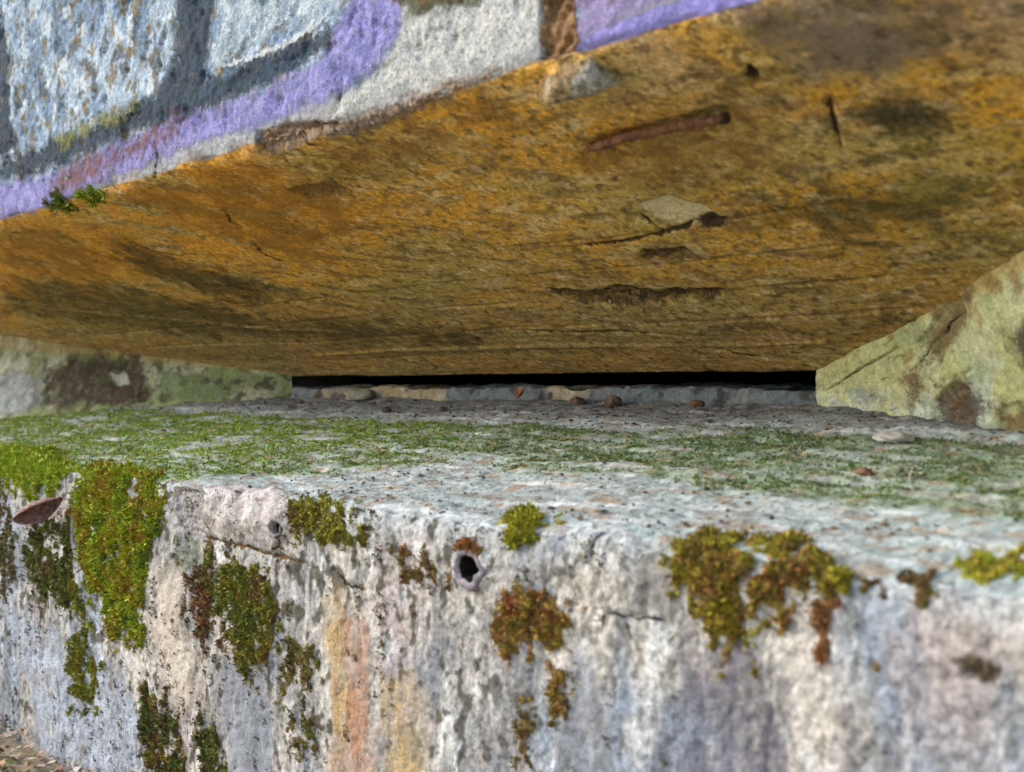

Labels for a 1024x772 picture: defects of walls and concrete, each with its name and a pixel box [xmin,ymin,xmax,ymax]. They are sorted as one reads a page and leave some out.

rust [585,112,731,153]
spalling [640,195,727,227]
crack [572,213,715,247]
spalling [550,284,730,306]
crack [915,314,963,368]